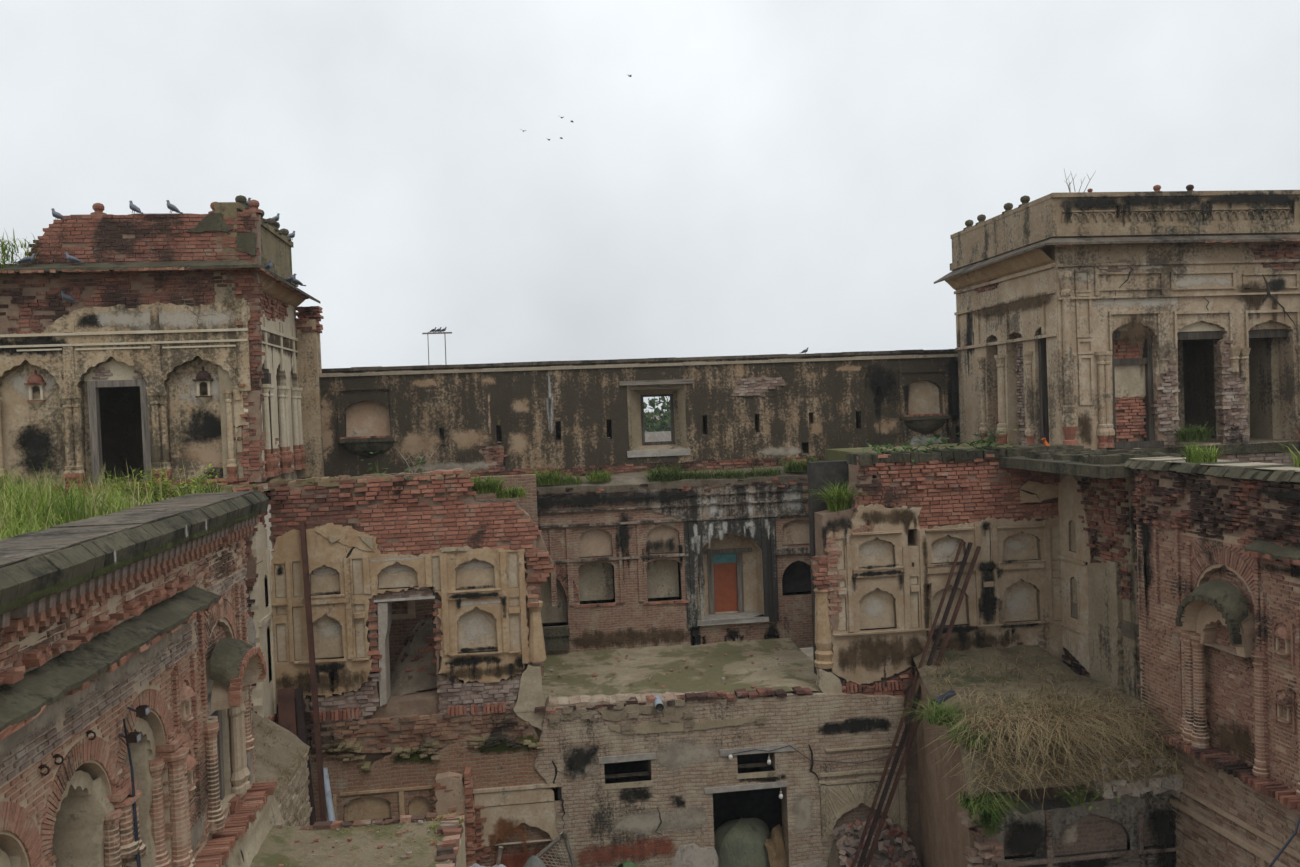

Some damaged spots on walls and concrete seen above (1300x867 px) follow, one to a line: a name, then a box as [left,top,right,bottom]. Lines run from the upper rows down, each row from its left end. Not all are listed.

water stain [1062,192,1300,227]
water stain [79,314,107,327]
water stain [0,336,67,355]
water stain [866,293,1050,445]
water stain [186,411,221,443]
flaking render [0,267,542,556]
water stain [16,425,57,481]
water stain [409,461,500,471]
water stain [758,447,802,456]